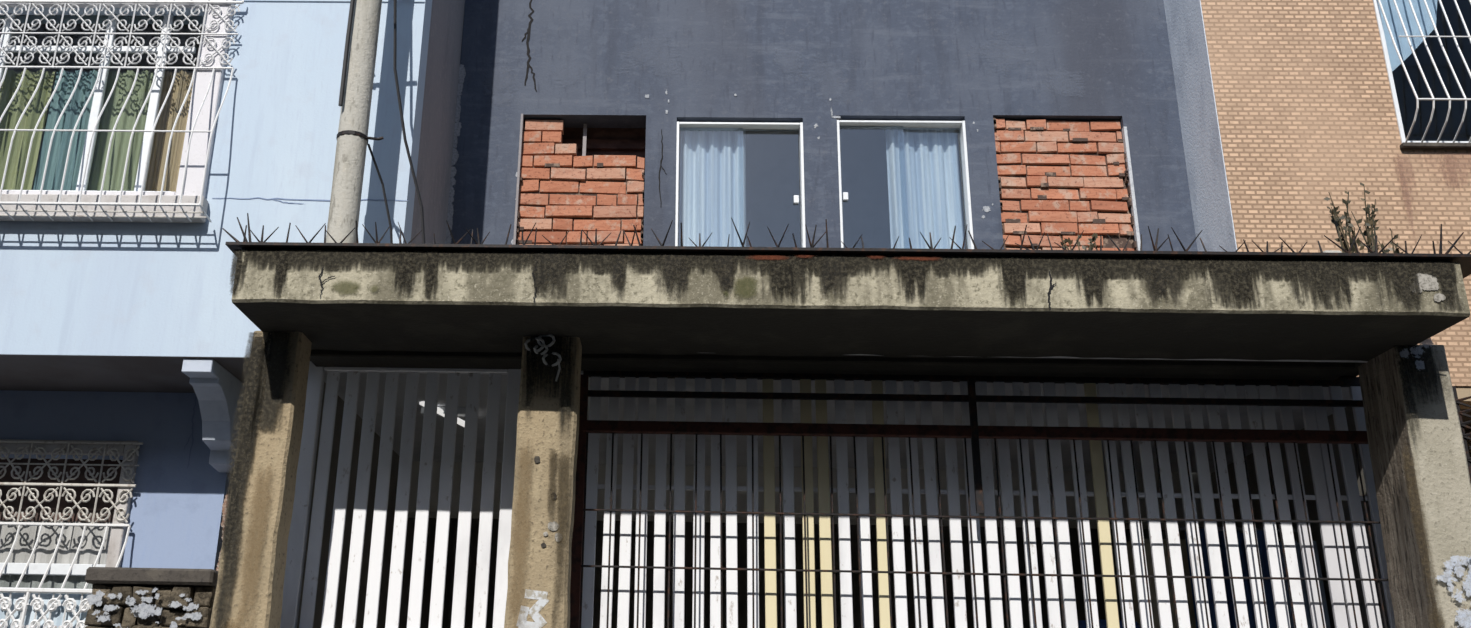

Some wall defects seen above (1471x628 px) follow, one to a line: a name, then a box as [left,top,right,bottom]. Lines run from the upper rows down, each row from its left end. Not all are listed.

crack [522,0,537,92]
water stain [230,249,1462,310]
peeling [86,587,202,628]
peeling [1437,555,1471,628]